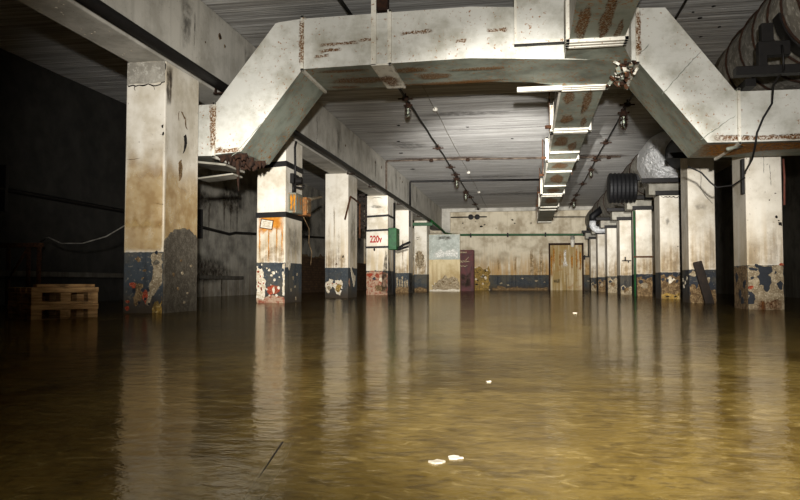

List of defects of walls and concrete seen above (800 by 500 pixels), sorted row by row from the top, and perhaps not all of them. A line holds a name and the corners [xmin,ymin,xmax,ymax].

rust [574,0,624,39]
rust [560,91,592,126]
rust [209,107,238,153]
rust [704,133,800,156]
rust [546,163,567,204]
water stain [126,161,211,249]
rust [259,217,283,253]
spalling [125,228,198,313]
peeling [256,263,298,303]
peeling [325,267,356,295]
peeling [366,270,460,295]
peeling [734,263,784,310]